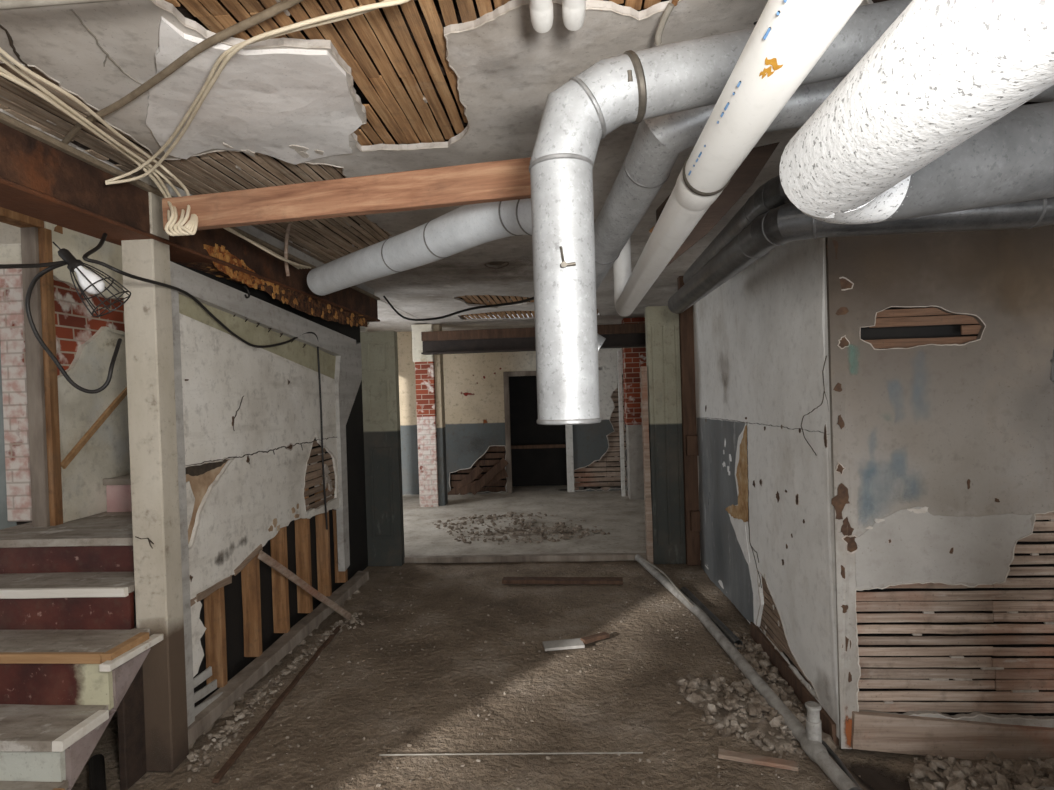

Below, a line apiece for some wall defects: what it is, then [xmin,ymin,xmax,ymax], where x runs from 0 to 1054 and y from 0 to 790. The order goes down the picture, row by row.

crack [71,9,142,85]
flaking render [0,62,347,195]
flaking render [149,0,530,152]
corrosion [759,57,784,79]
spalling [53,272,125,381]
spalling [837,306,986,350]
peeling [185,456,250,551]
flaking render [190,544,263,716]
crack [185,437,337,466]
peeling [696,406,819,700]
crack [701,356,829,588]
spalling [831,462,1054,720]